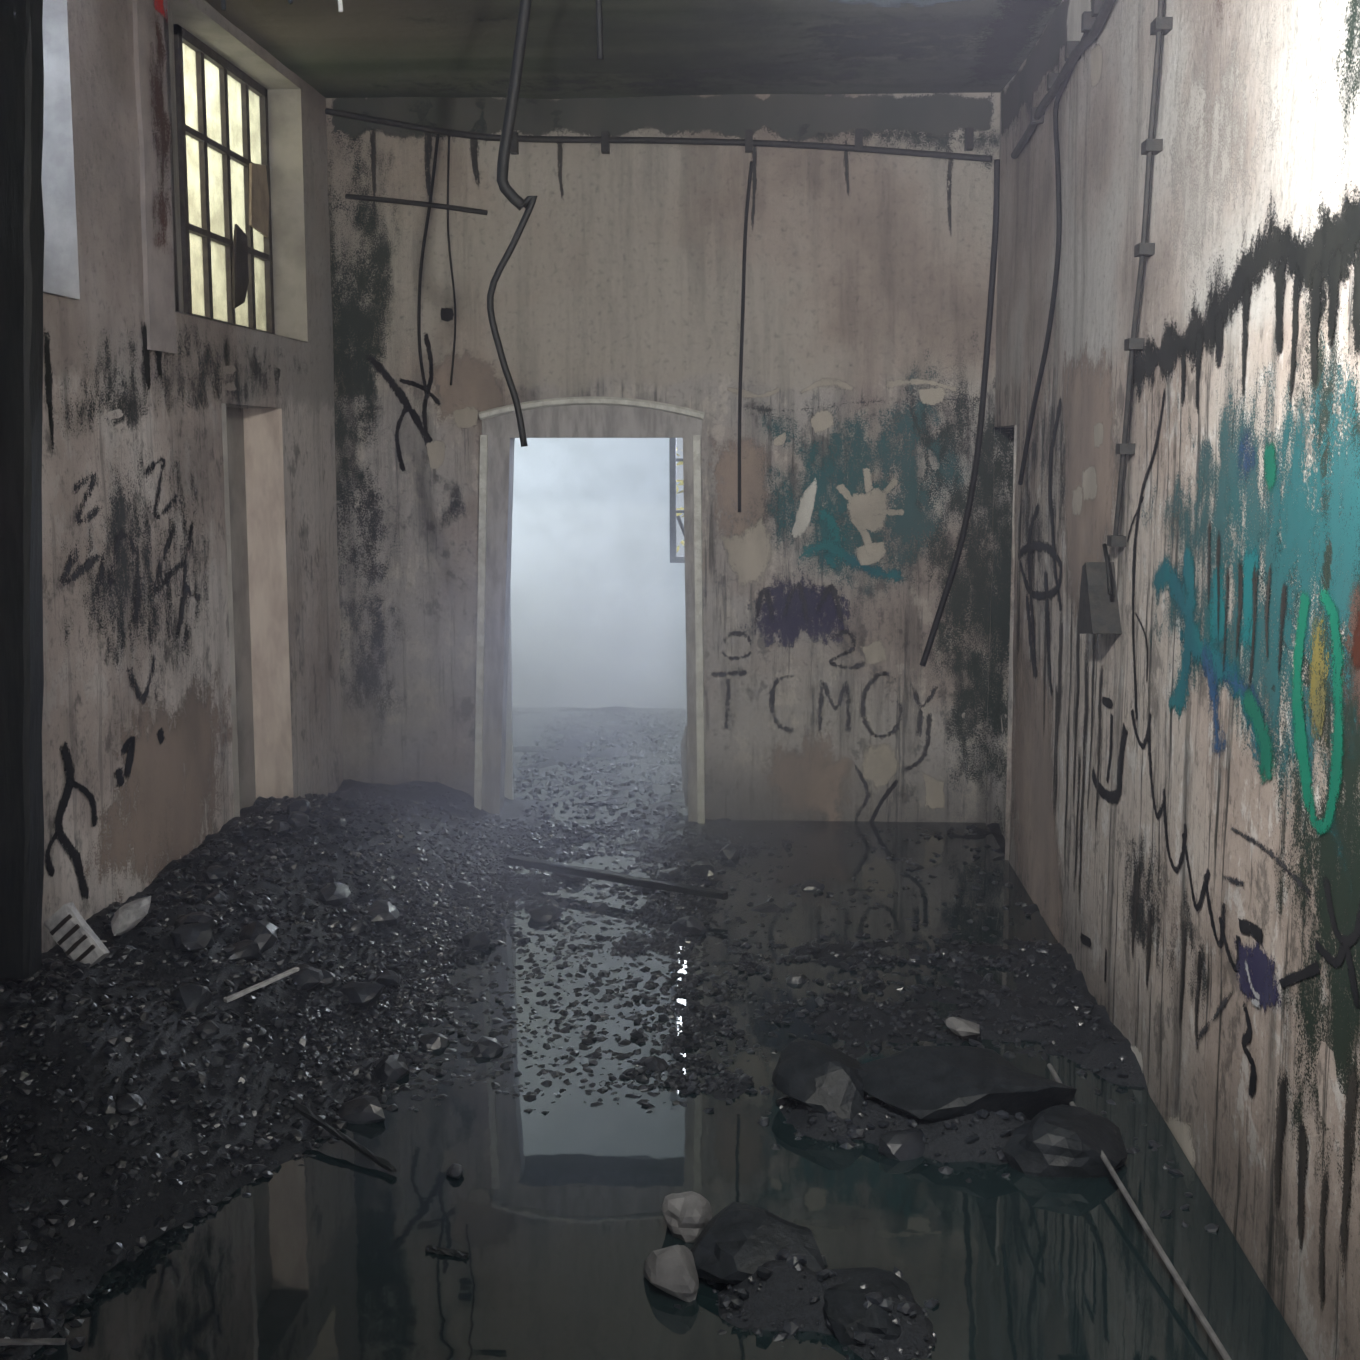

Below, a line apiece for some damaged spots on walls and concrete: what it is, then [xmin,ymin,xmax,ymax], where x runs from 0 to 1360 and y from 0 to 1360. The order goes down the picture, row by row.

damp [327,0,1070,784]
damp [904,331,1103,923]
damp [1116,832,1211,1049]
damp [1132,0,1360,1308]